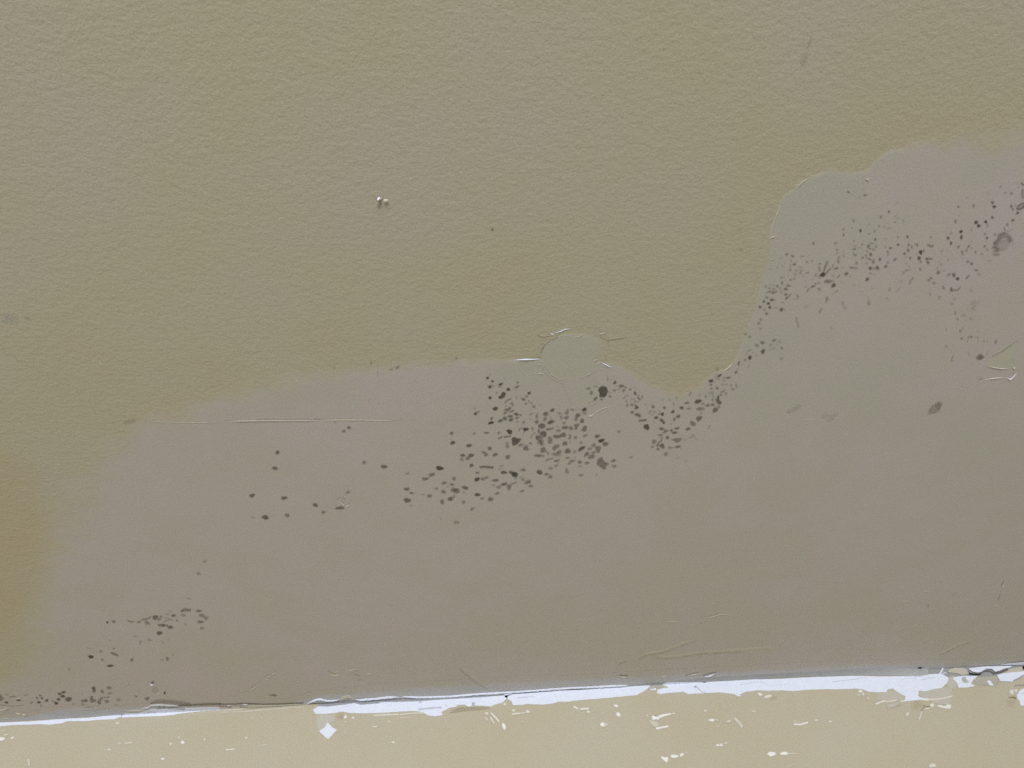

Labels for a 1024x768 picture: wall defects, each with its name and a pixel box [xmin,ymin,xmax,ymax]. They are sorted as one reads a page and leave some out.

damp [0,344,147,704]
peeling [313,662,1024,739]